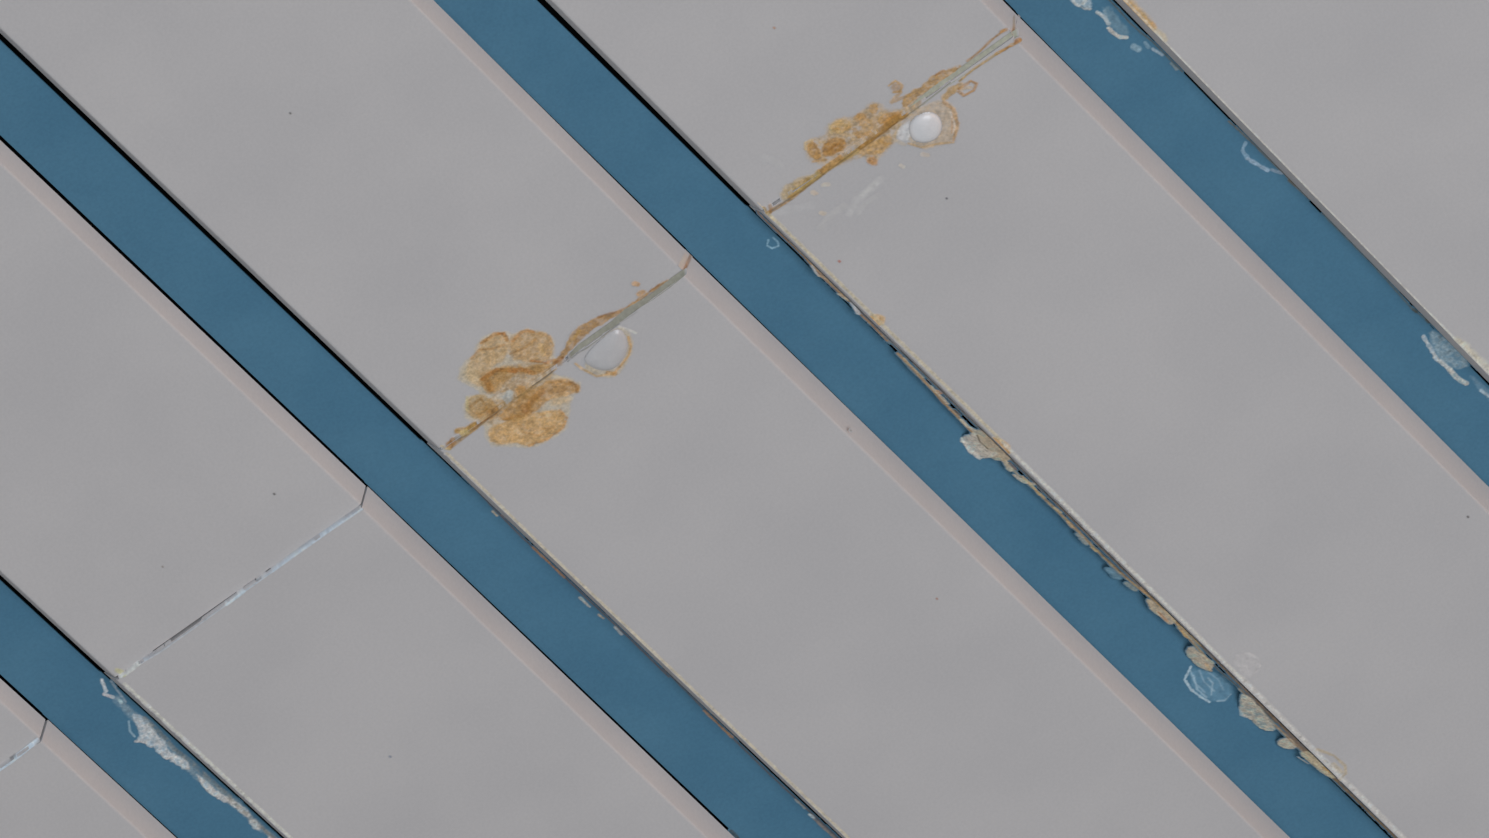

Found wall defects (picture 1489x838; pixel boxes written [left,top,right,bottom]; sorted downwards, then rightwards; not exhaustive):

crack [770,28,1019,211]
peeling [1068,0,1178,72]
rust [1107,0,1184,73]
rust [1227,119,1444,337]
rust [439,250,693,452]
crack [457,268,687,442]
peeling [958,429,1012,462]
rust [755,14,1397,838]
crack [113,505,364,679]
crack [0,737,40,772]
peeling [1182,664,1235,704]